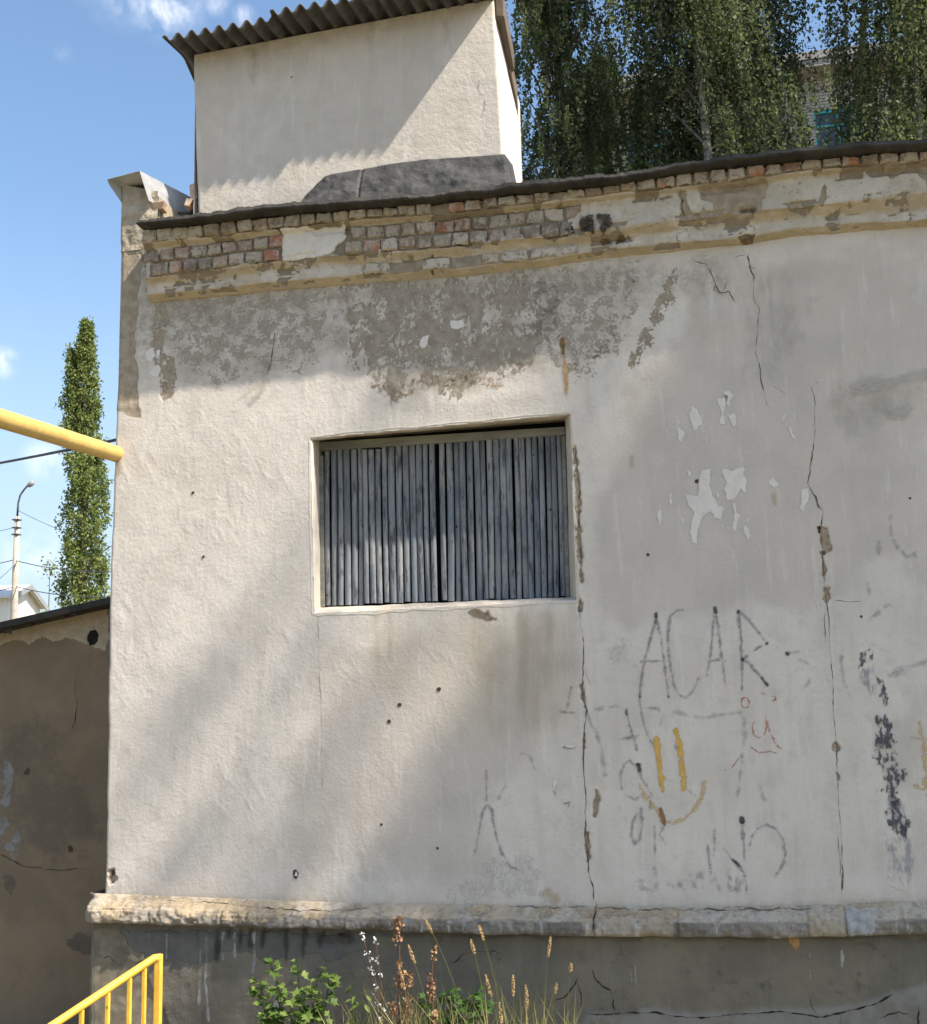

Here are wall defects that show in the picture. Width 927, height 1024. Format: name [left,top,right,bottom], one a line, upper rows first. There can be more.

flaking render [117,152,927,418]
rust [560,338,568,392]
flaking render [573,446,584,583]
peeling [681,464,751,543]
crack [677,189,860,890]
crack [511,598,809,933]
crack [0,854,80,871]
water stain [120,926,372,1022]
crack [549,970,919,1024]